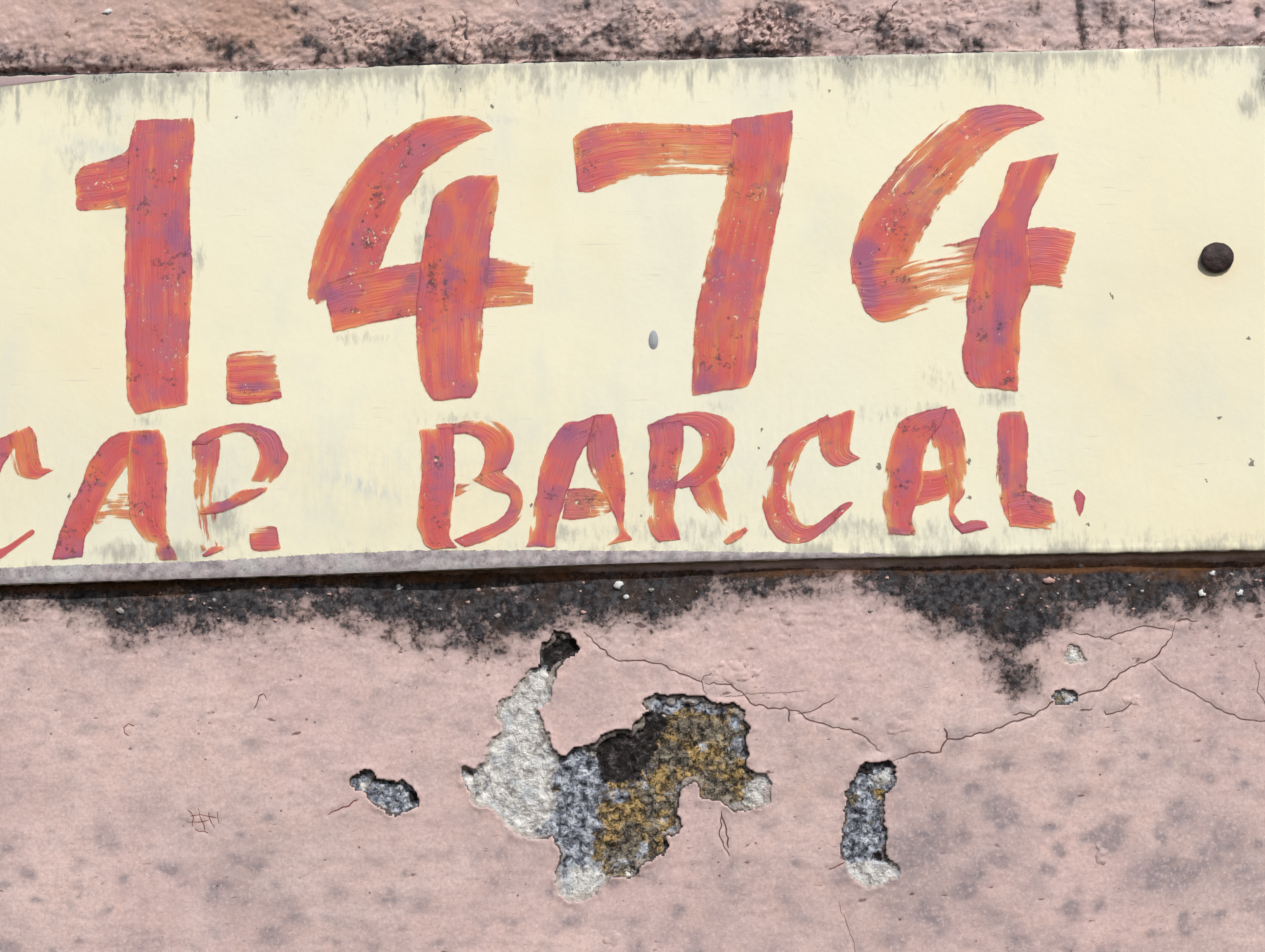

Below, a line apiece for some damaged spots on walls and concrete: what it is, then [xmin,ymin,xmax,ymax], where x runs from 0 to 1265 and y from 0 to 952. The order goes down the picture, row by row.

mould [0,47,177,77]
mould [205,35,275,72]
mould [287,0,821,70]
mould [875,13,1009,54]
mould [1075,0,1087,50]
mould [1101,2,1129,37]
water stain [0,561,1265,700]
crack [585,618,1265,761]
flaking render [462,630,772,902]
flaking render [349,769,419,817]
flaking render [840,760,900,889]